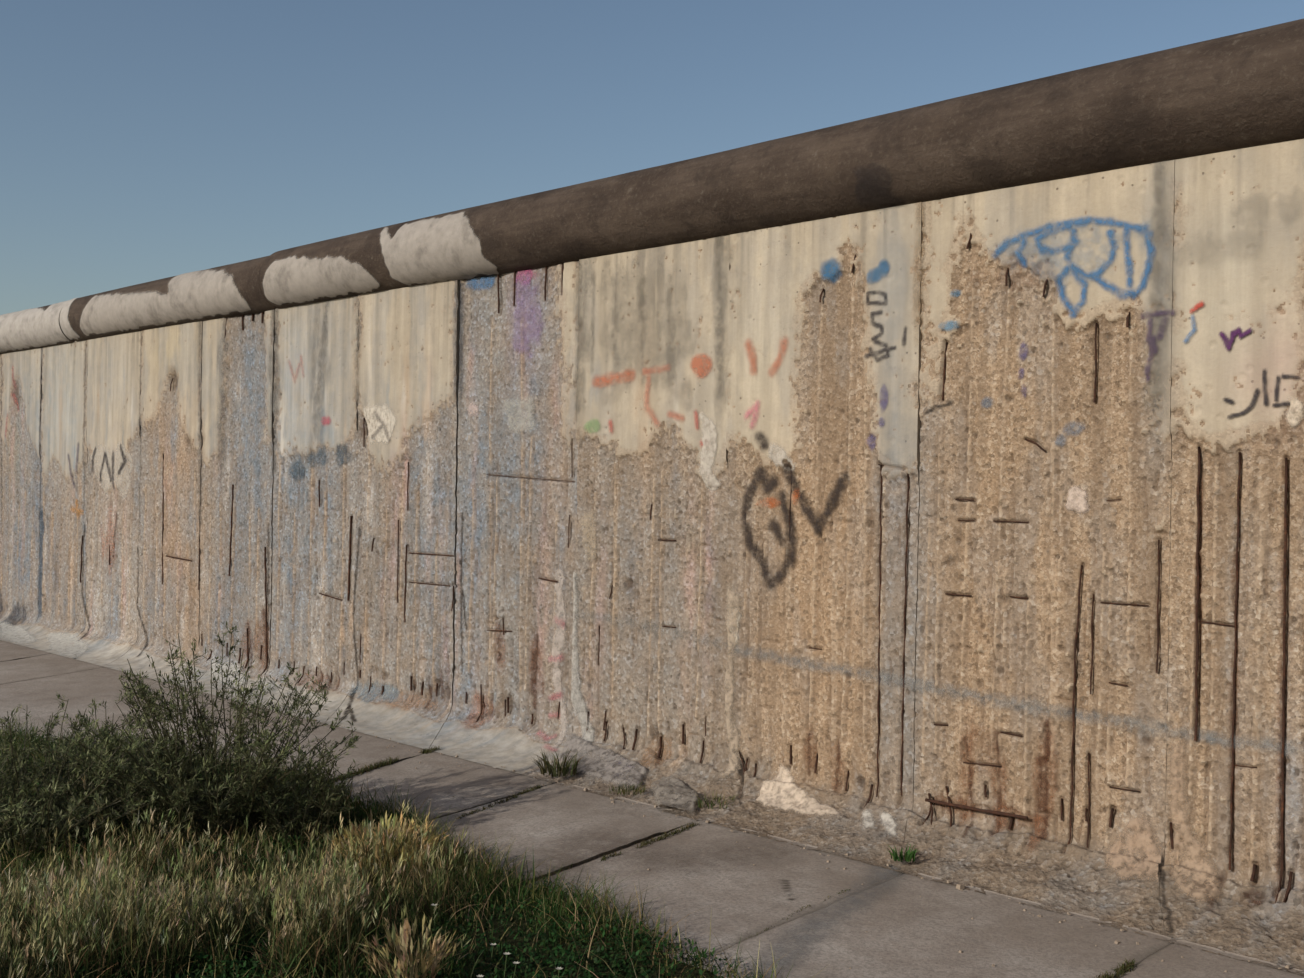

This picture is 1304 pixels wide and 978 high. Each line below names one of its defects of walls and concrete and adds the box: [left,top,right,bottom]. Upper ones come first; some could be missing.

spalling [0,202,1304,976]
corrosion [1038,722,1050,838]